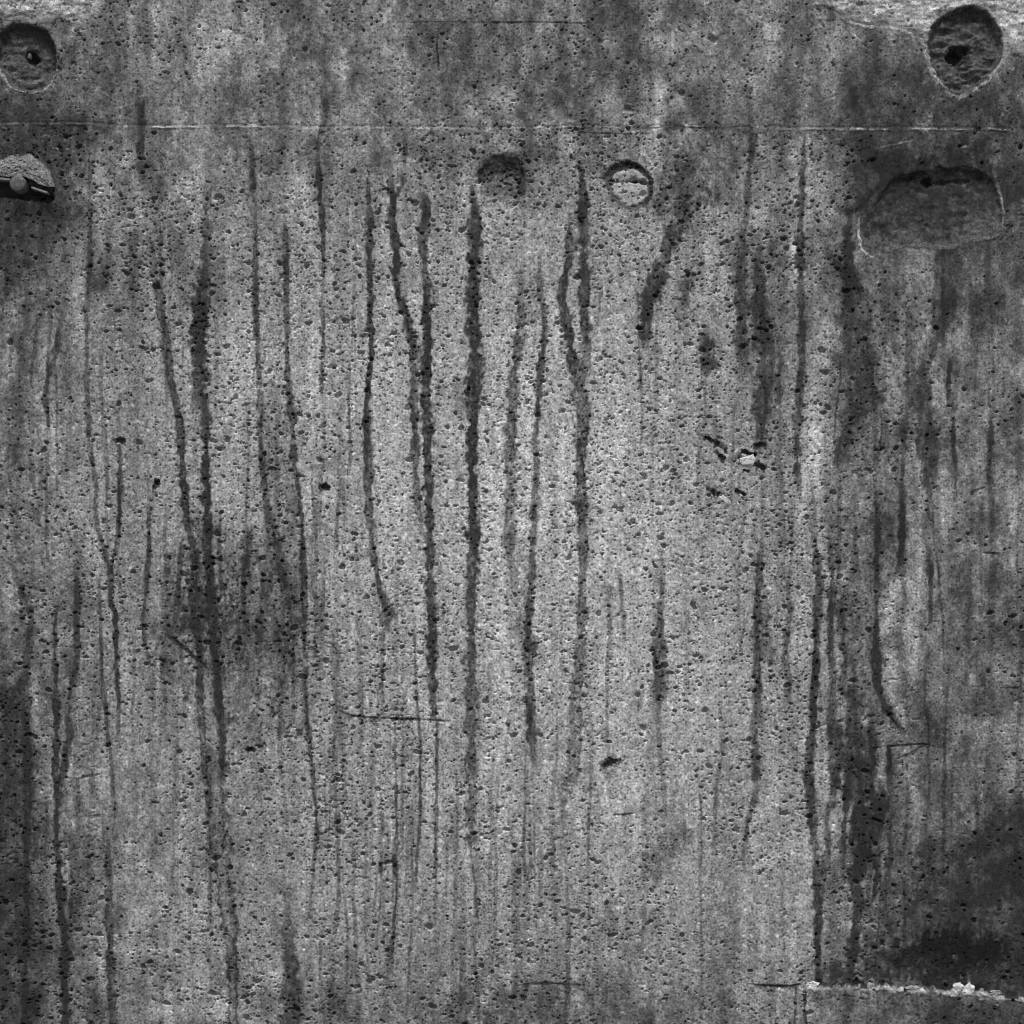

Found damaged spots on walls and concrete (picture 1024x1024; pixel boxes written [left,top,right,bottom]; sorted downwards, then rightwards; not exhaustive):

leakage [0,580,81,1024]
leakage [93,480,123,743]
leakage [141,222,328,1024]
leakage [315,161,325,273]
leakage [361,185,395,649]
leakage [386,178,439,889]
leakage [463,195,485,773]
leakage [522,168,593,749]
leakage [636,163,720,340]
leakage [802,490,1024,1024]
leakage [888,280,958,506]
peeling [826,0,1024,51]